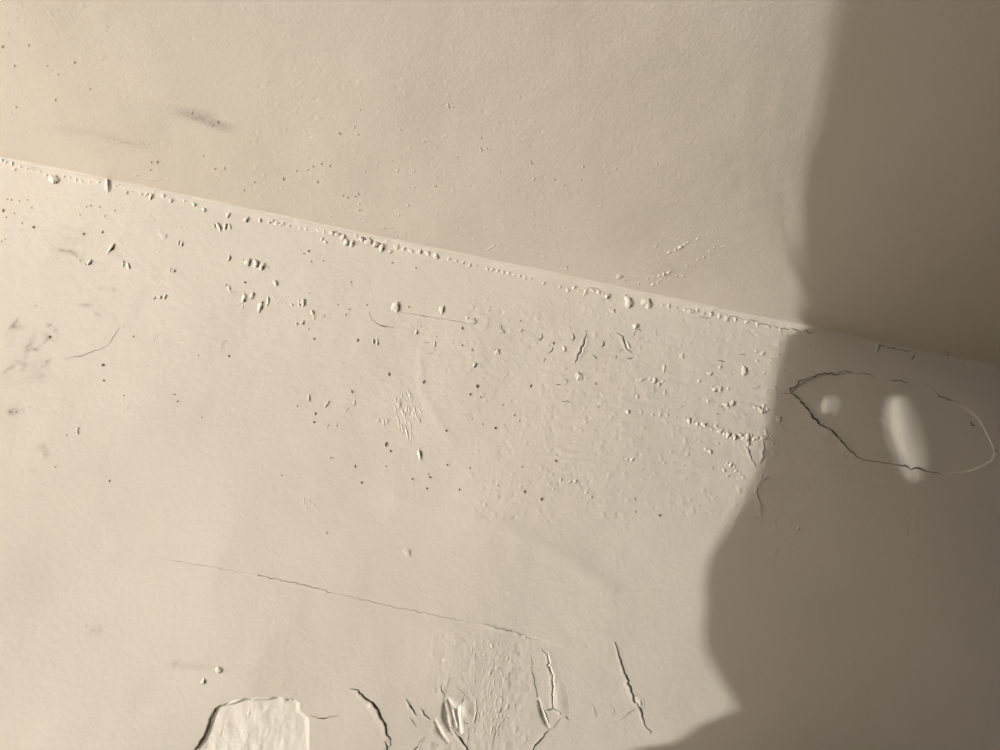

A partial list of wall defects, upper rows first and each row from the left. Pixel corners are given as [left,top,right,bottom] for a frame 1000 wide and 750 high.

spalling [227,254,270,271]
peeling [320,231,477,267]
spalling [224,281,311,314]
crack [155,557,569,750]
crack [613,642,651,734]
peeling [192,694,311,750]